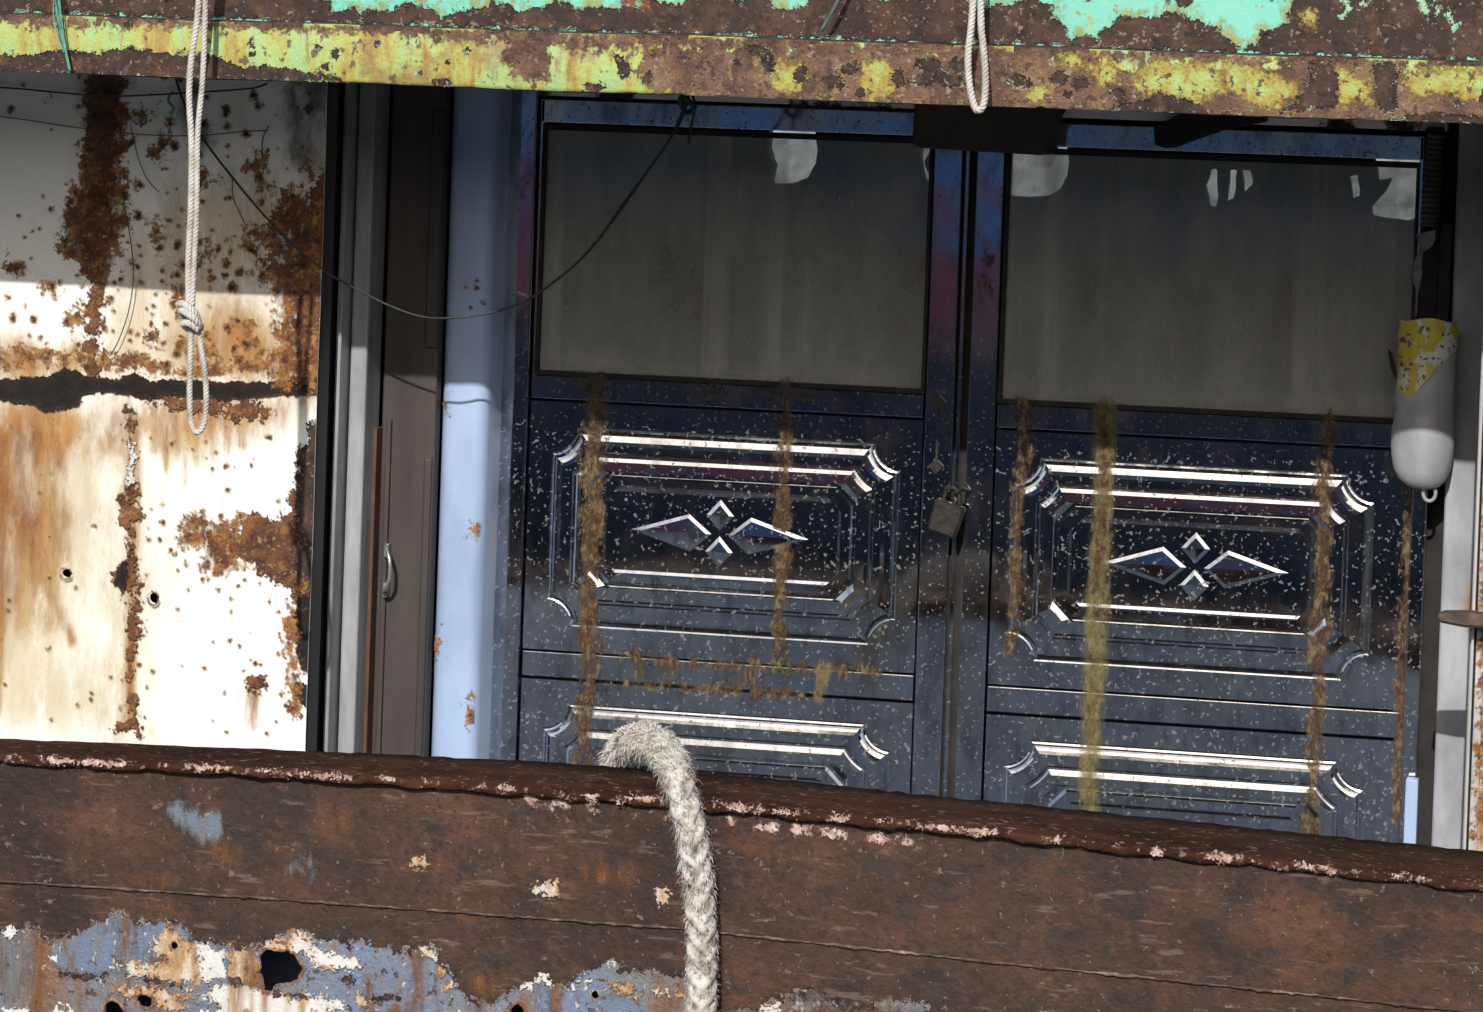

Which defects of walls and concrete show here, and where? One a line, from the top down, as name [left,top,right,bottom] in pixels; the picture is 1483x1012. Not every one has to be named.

peeling [855,54,899,102]
peeling [1057,50,1301,111]
peeling [1416,0,1463,34]
peeling [1401,63,1483,105]
rust [0,0,1483,740]
water stain [572,372,881,765]
water stain [1003,395,1034,656]
water stain [1080,398,1115,811]
water stain [1300,409,1336,835]
peeling [48,917,374,1012]
rust [0,757,688,1012]
rust [700,797,1483,1012]